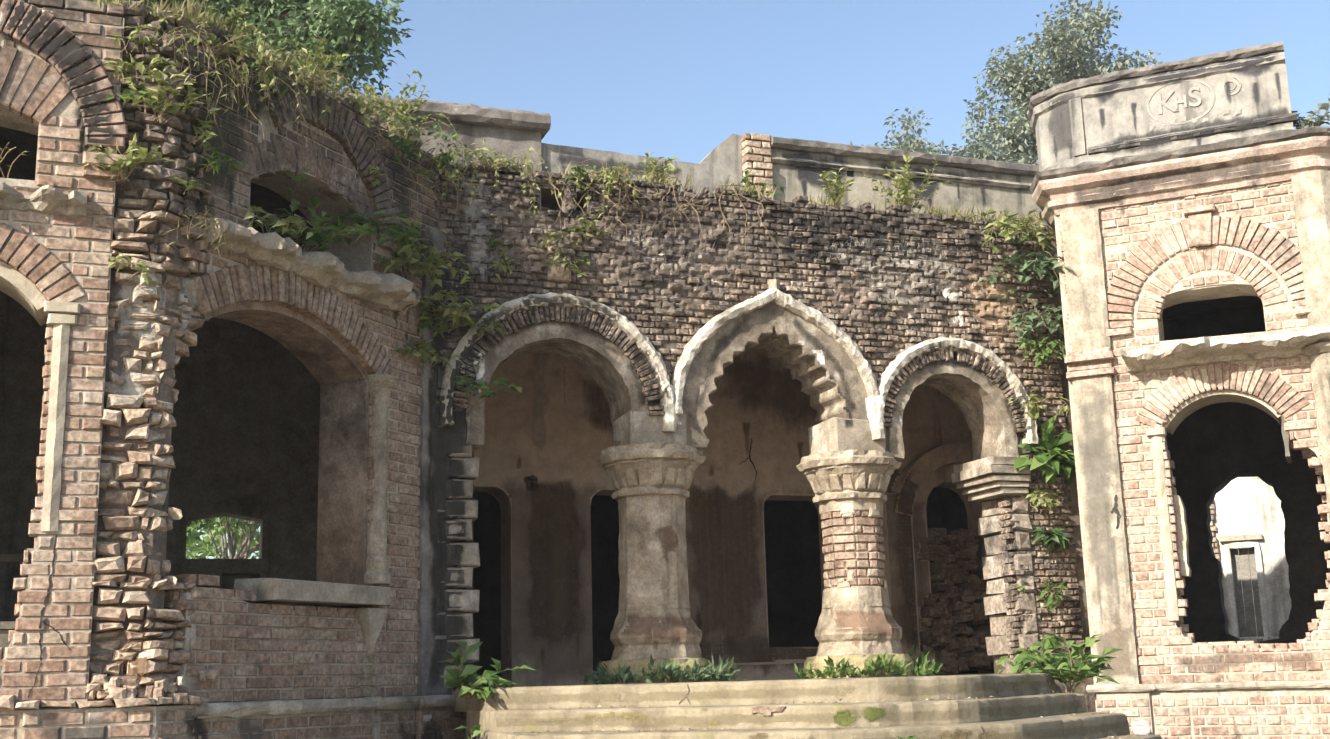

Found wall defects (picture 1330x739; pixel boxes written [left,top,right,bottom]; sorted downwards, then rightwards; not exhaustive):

damp [560,155,676,183]
flaking render [88,261,198,702]
damp [394,236,617,686]
crack [28,535,71,698]
damp [46,721,105,739]
damp [185,715,208,739]